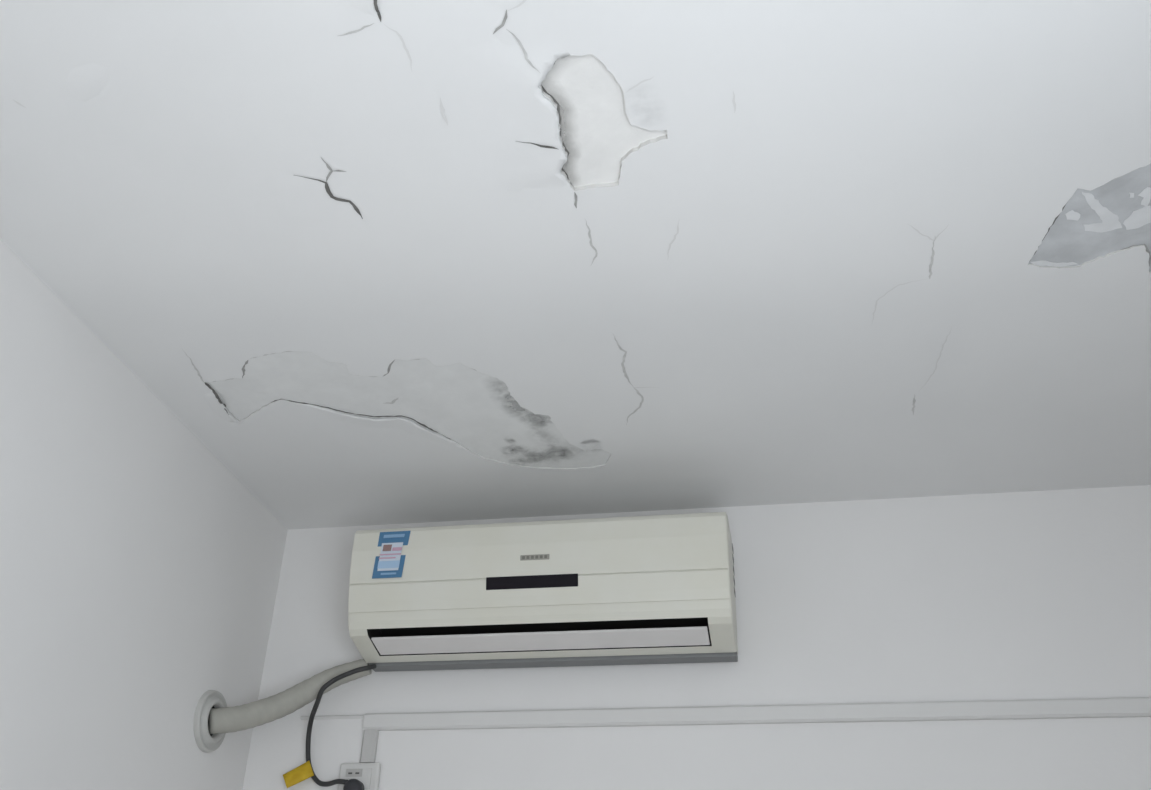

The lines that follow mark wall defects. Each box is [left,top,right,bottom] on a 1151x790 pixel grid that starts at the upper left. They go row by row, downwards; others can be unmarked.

crack [339,0,412,70]
crack [295,158,363,219]
peeling [450,33,667,265]
peeling [1028,164,1151,274]
peeling [186,351,611,469]
crack [613,334,659,425]